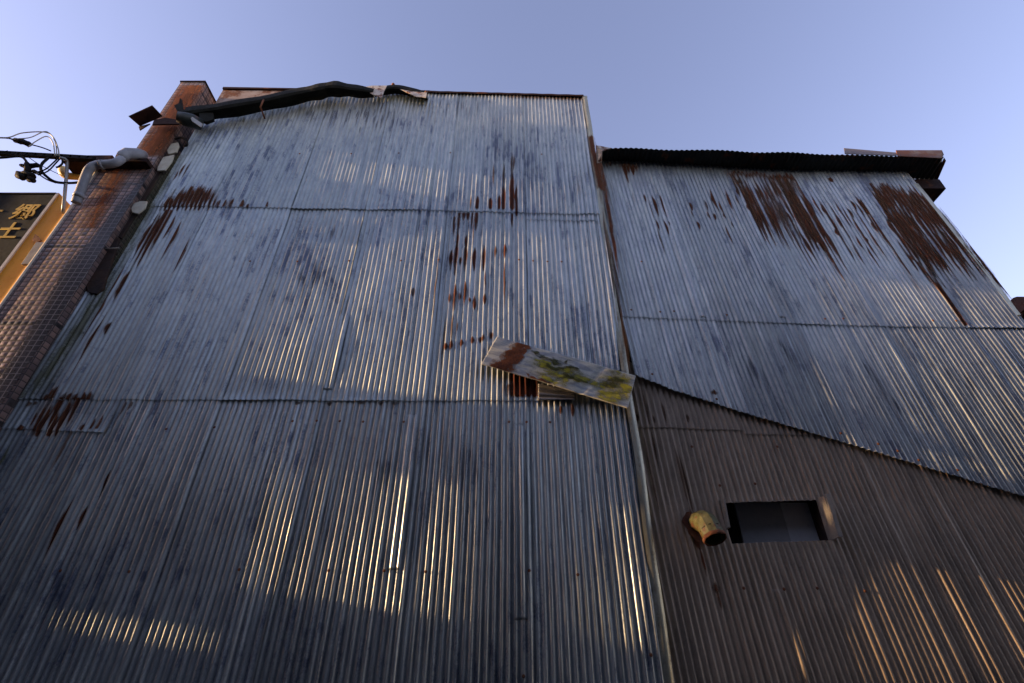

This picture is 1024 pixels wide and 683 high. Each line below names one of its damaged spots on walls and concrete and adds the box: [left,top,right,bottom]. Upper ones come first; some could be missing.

corrosion [70,164,249,376]
corrosion [430,158,518,365]
corrosion [644,195,670,251]
corrosion [689,170,1016,326]
corrosion [17,386,103,469]
corrosion [490,342,551,397]